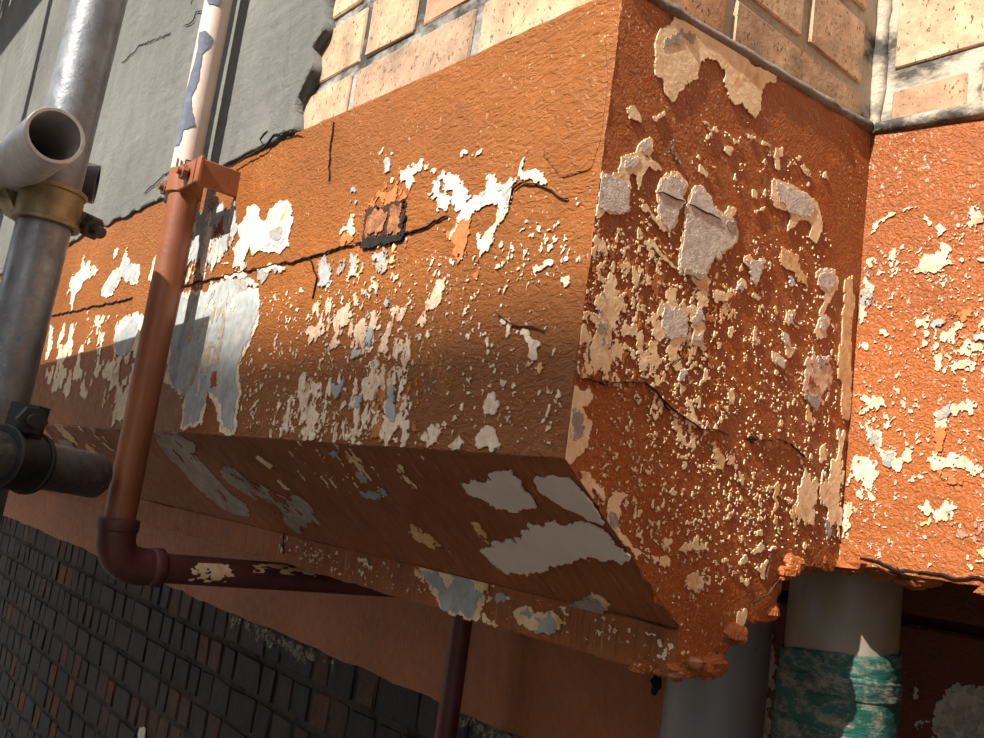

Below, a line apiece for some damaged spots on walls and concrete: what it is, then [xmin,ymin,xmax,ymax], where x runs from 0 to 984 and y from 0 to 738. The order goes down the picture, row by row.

crack [227,128,301,168]
crack [327,122,335,182]
crack [508,182,568,204]
crack [387,215,449,238]
crack [52,297,133,316]
peeling [67,247,156,311]
crack [181,241,361,299]
peeling [154,17,984,682]
peeling [44,310,144,454]
crack [584,378,729,435]
crack [862,557,984,580]
peeling [914,682,984,738]